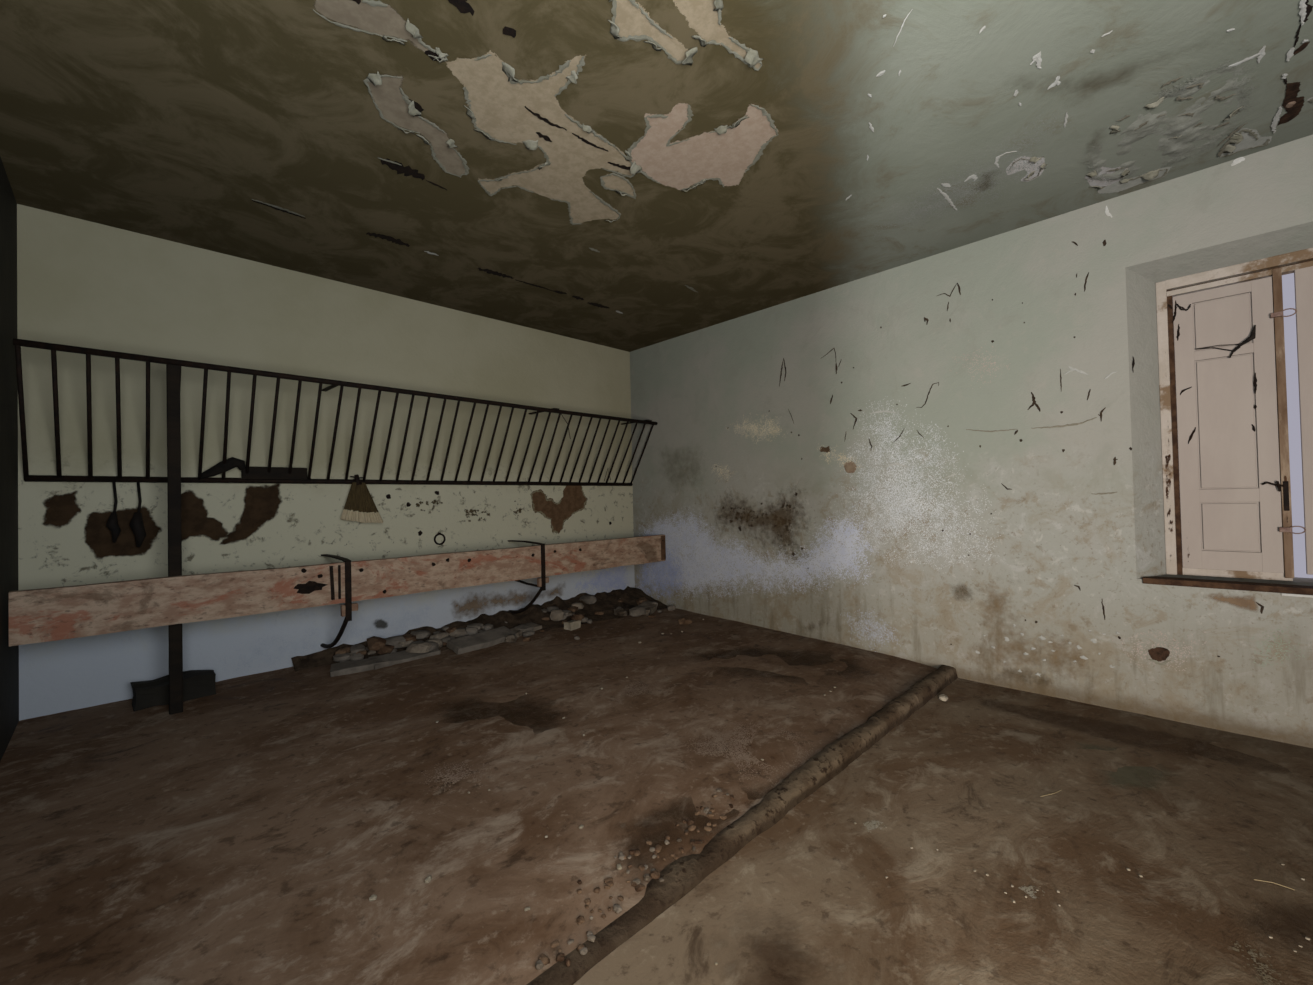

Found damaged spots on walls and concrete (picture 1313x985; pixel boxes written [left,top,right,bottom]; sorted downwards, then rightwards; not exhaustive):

peeling [313,0,779,225]
peeling [1217,128,1272,166]
peeling [1006,156,1047,182]
flaking render [513,486,587,534]
water stain [573,396,1002,604]
water stain [455,593,532,615]
spalling [1148,647,1171,665]